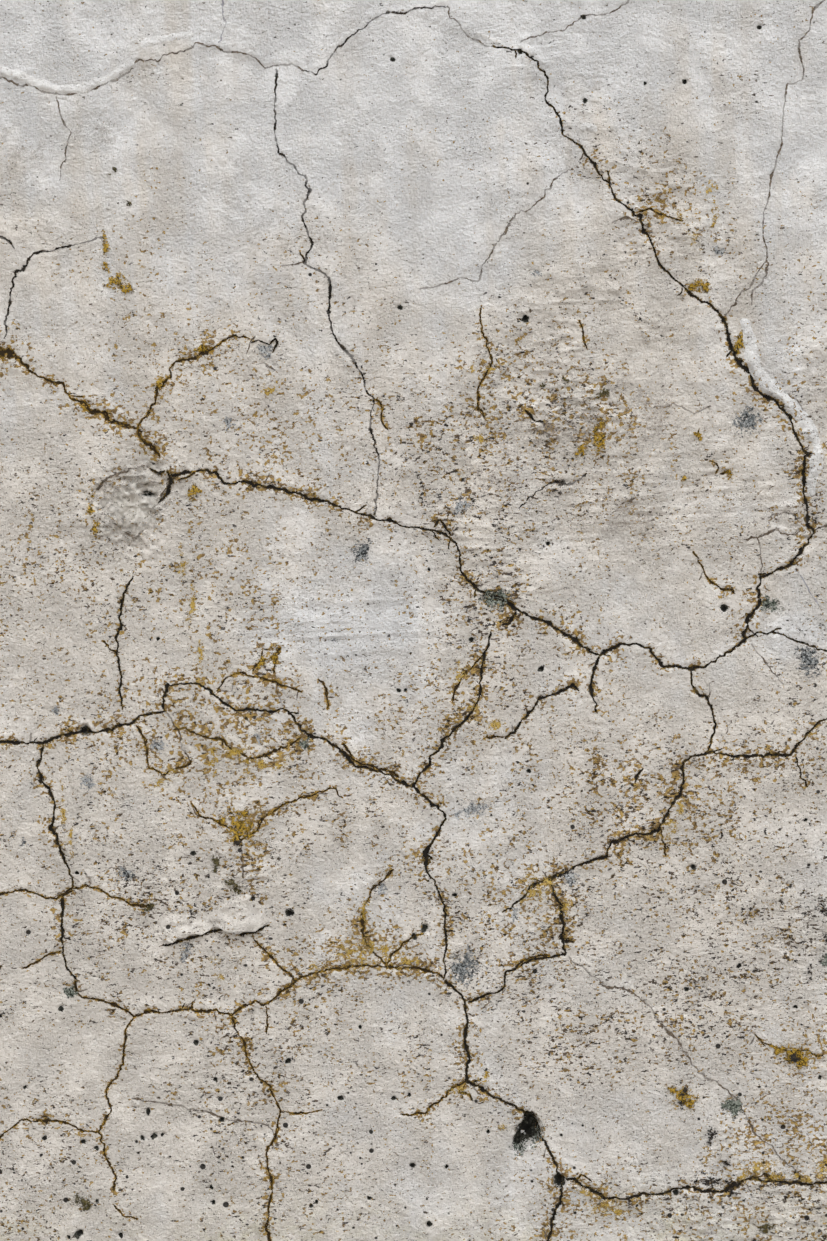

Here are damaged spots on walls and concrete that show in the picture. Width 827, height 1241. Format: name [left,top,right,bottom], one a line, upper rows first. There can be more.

crack [297,5,457,76]
crack [521,5,623,42]
crack [785,0,825,96]
crack [0,77,101,180]
crack [0,236,255,457]
crack [127,33,827,913]
crack [102,576,134,710]
crack [0,631,576,1241]
crack [587,972,698,1070]
crack [751,1032,824,1060]
crack [533,1116,827,1241]